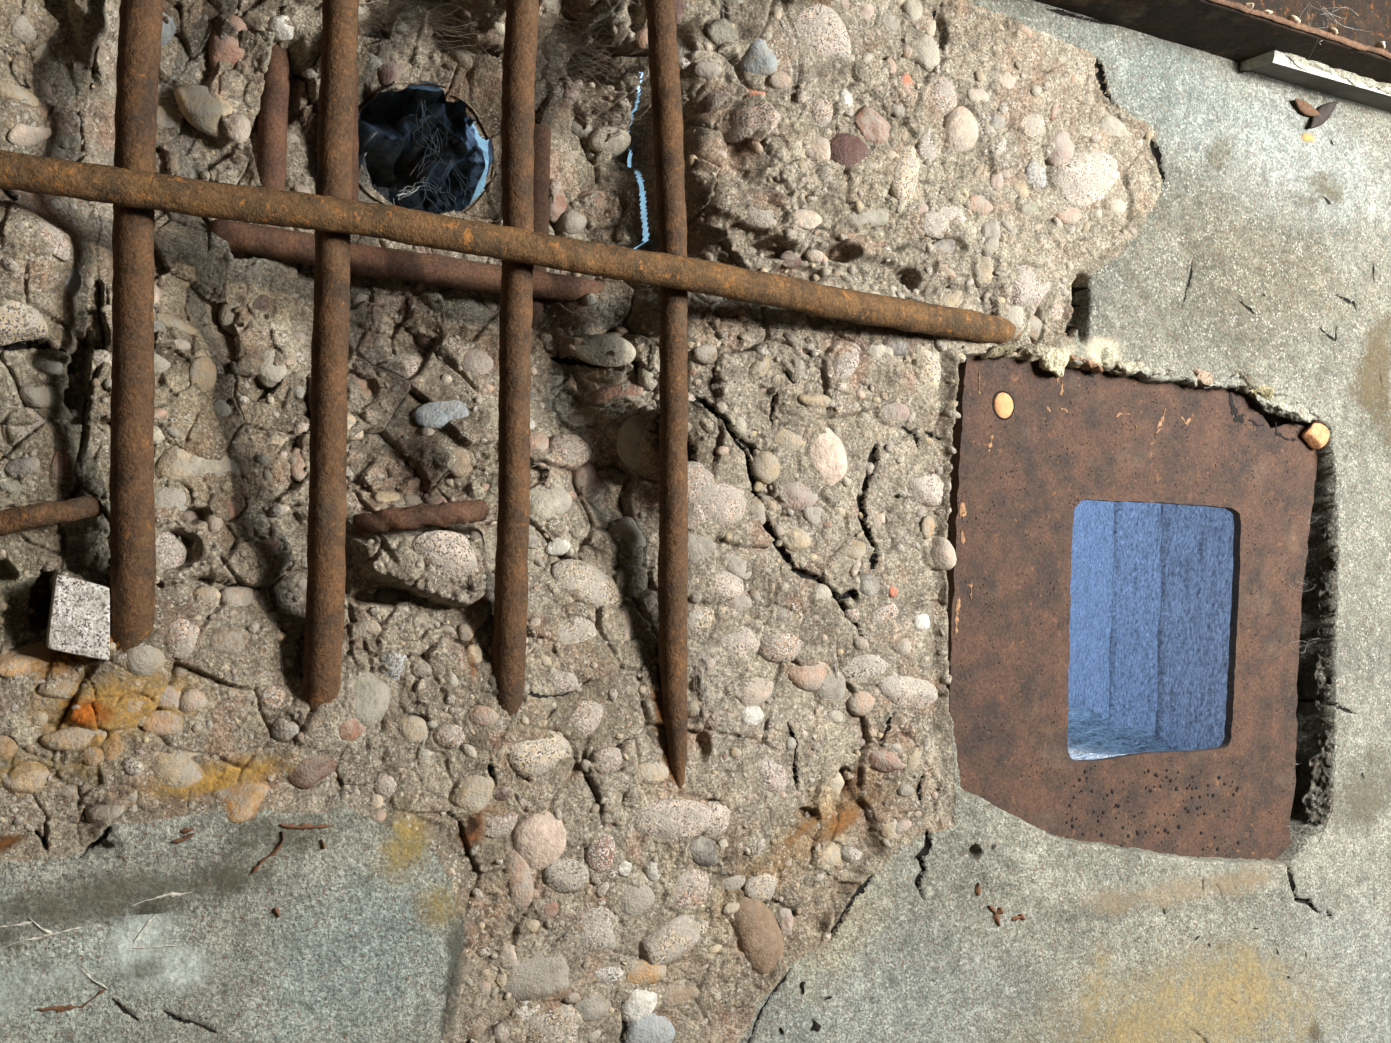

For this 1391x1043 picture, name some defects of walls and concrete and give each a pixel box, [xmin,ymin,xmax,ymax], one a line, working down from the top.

spalling [0,0,1162,377]
spalling [1107,359,1176,378]
spalling [1183,368,1326,423]
crack [687,438,696,462]
crack [694,371,940,635]
corrosion [959,499,967,544]
spalling [0,189,1004,1043]
corrosion [35,650,89,674]
corrosion [46,678,181,746]
corrosion [652,676,673,778]
crack [788,727,799,789]
crack [878,717,892,741]